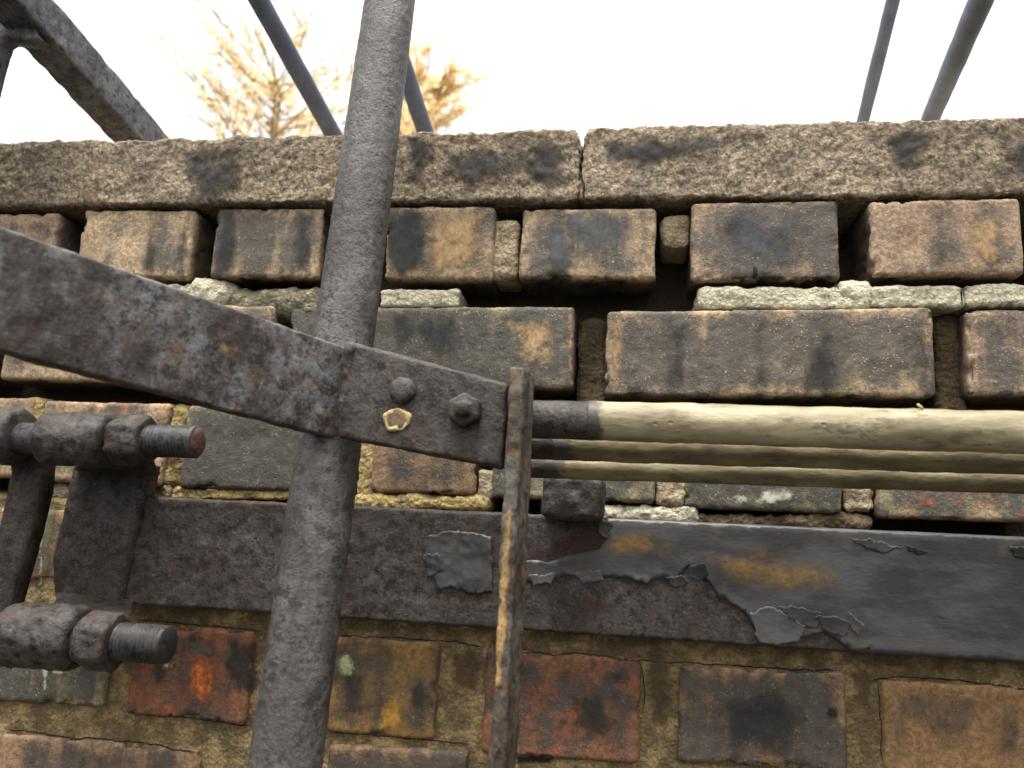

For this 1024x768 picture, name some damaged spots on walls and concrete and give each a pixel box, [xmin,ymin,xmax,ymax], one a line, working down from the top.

damp [410,138,433,180]
damp [448,141,564,185]
peeling [423,530,493,595]
peeling [526,518,1024,663]
corrosion [191,661,213,700]
crack [870,676,1024,757]